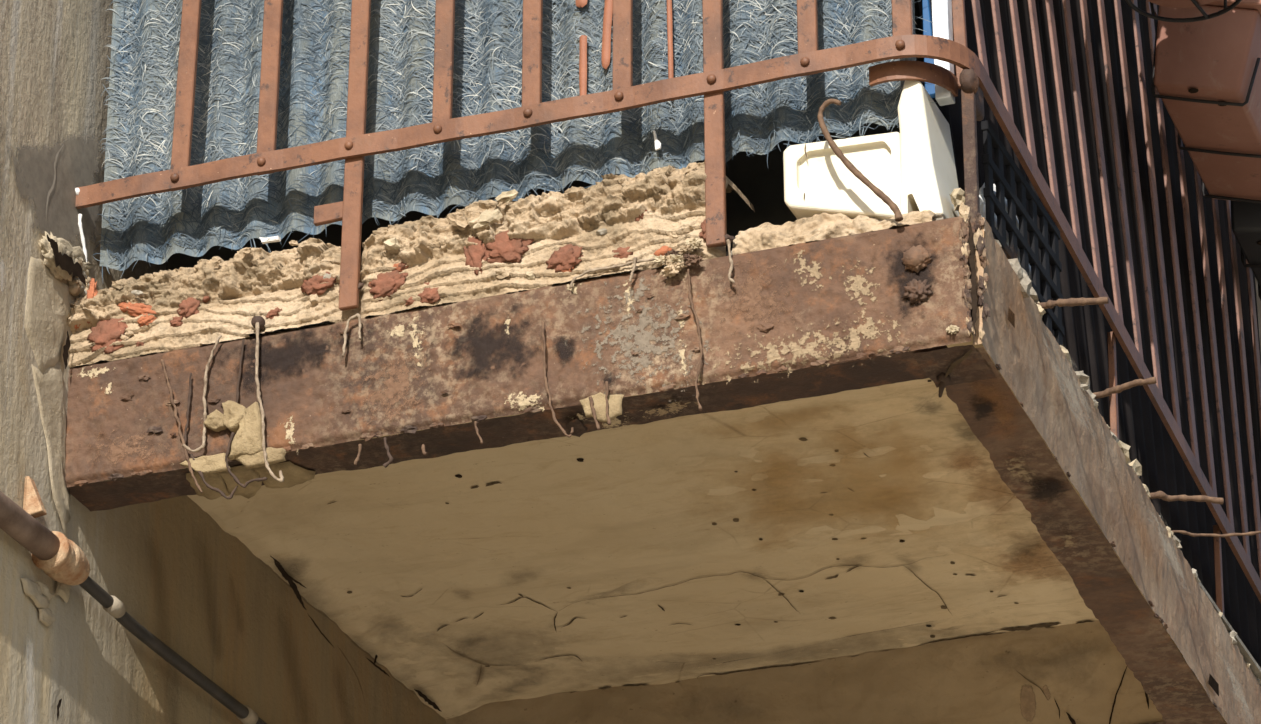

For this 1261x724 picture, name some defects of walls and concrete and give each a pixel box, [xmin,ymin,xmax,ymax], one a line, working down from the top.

spalling [817,99,903,222]
corrosion [891,251,935,313]
flaking render [0,112,115,539]
corrosion [237,327,350,391]
corrosion [451,307,534,378]
corrosion [555,337,574,362]
spalling [1053,363,1157,425]
peeling [280,416,298,453]
crack [438,555,1094,684]
crack [571,661,820,693]
crack [1018,672,1076,724]
crack [1109,667,1149,724]